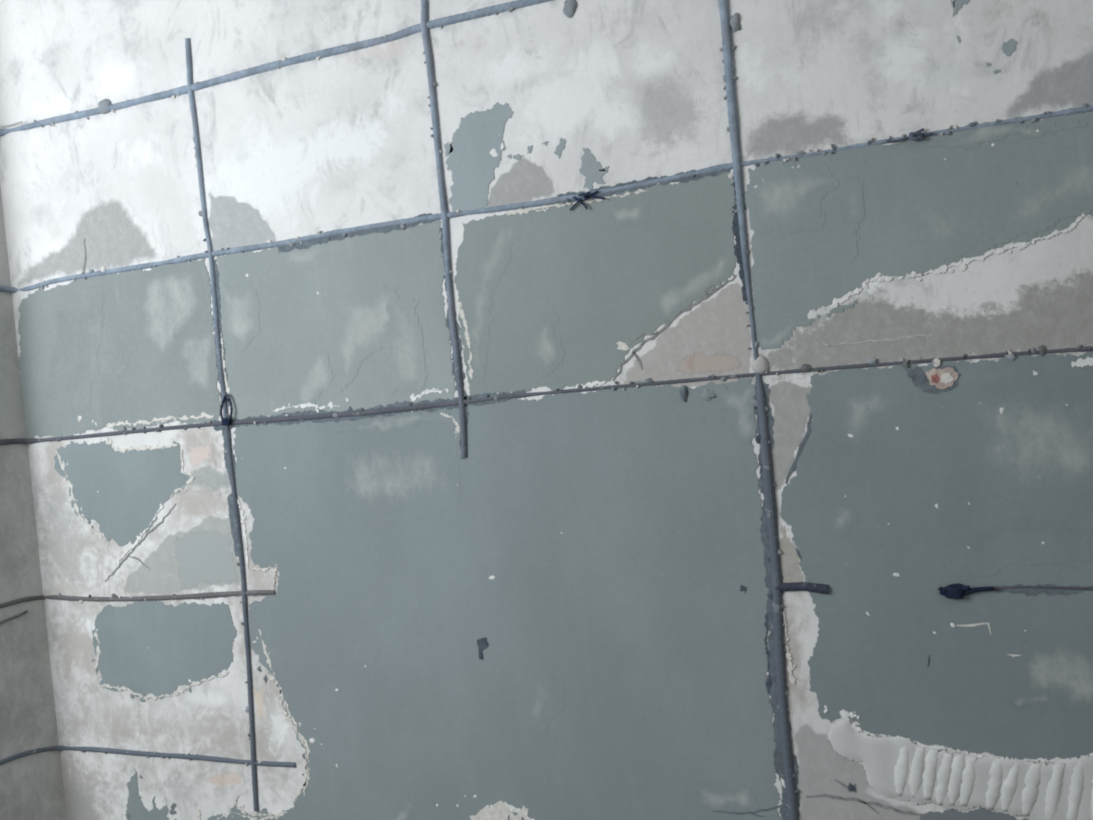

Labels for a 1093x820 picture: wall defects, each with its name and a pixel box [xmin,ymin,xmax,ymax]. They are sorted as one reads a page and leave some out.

peeling [950,0,969,16]
peeling [1001,39,1017,56]
peeling [744,108,1093,350]
peeling [18,102,781,820]
peeling [780,351,1093,761]
peeling [920,807,1029,820]